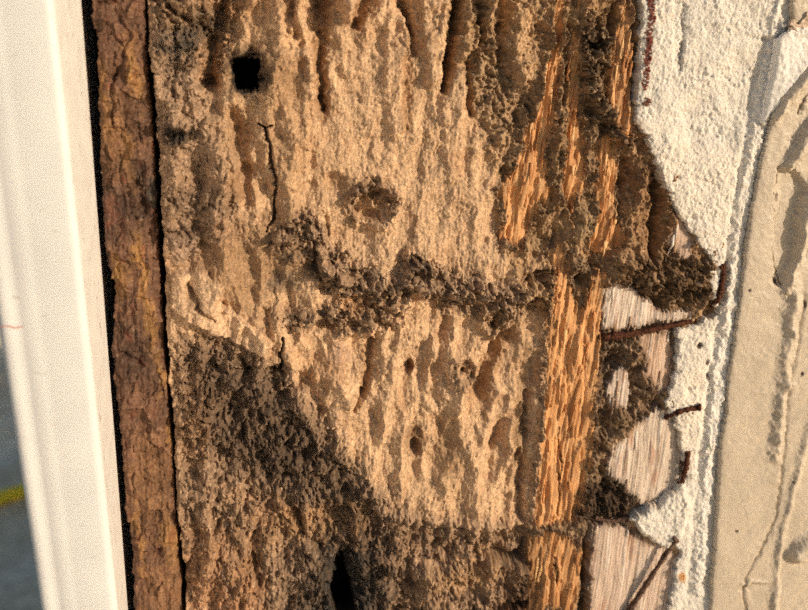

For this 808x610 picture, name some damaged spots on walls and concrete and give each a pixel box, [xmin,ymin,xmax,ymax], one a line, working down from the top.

corrosion [641,0,656,106]
peeling [760,12,808,126]
water stain [164,125,195,147]
crack [258,123,279,232]
peeling [637,262,704,296]
water stain [299,520,405,610]